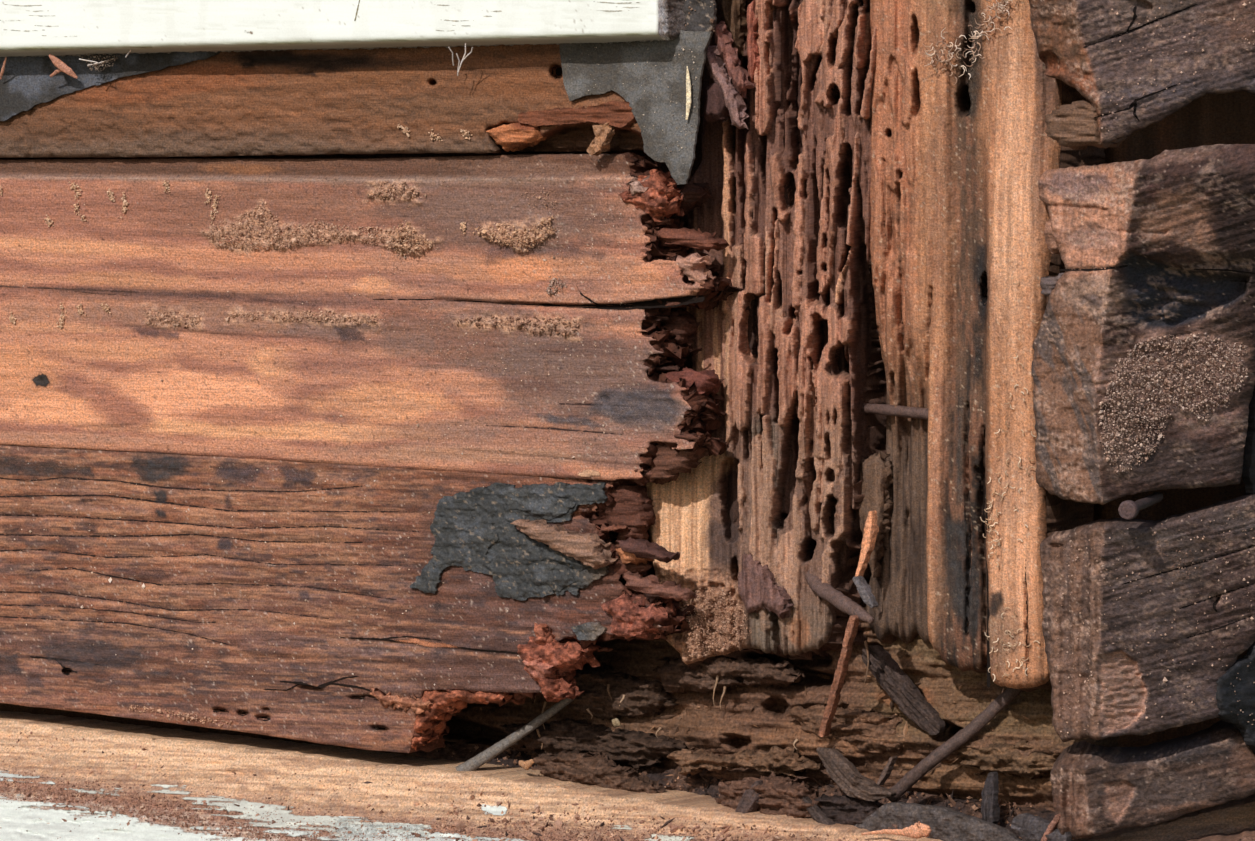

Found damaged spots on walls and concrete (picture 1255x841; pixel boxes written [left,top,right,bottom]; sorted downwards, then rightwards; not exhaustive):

crack [264,676,371,692]
spalling [0,149,942,841]